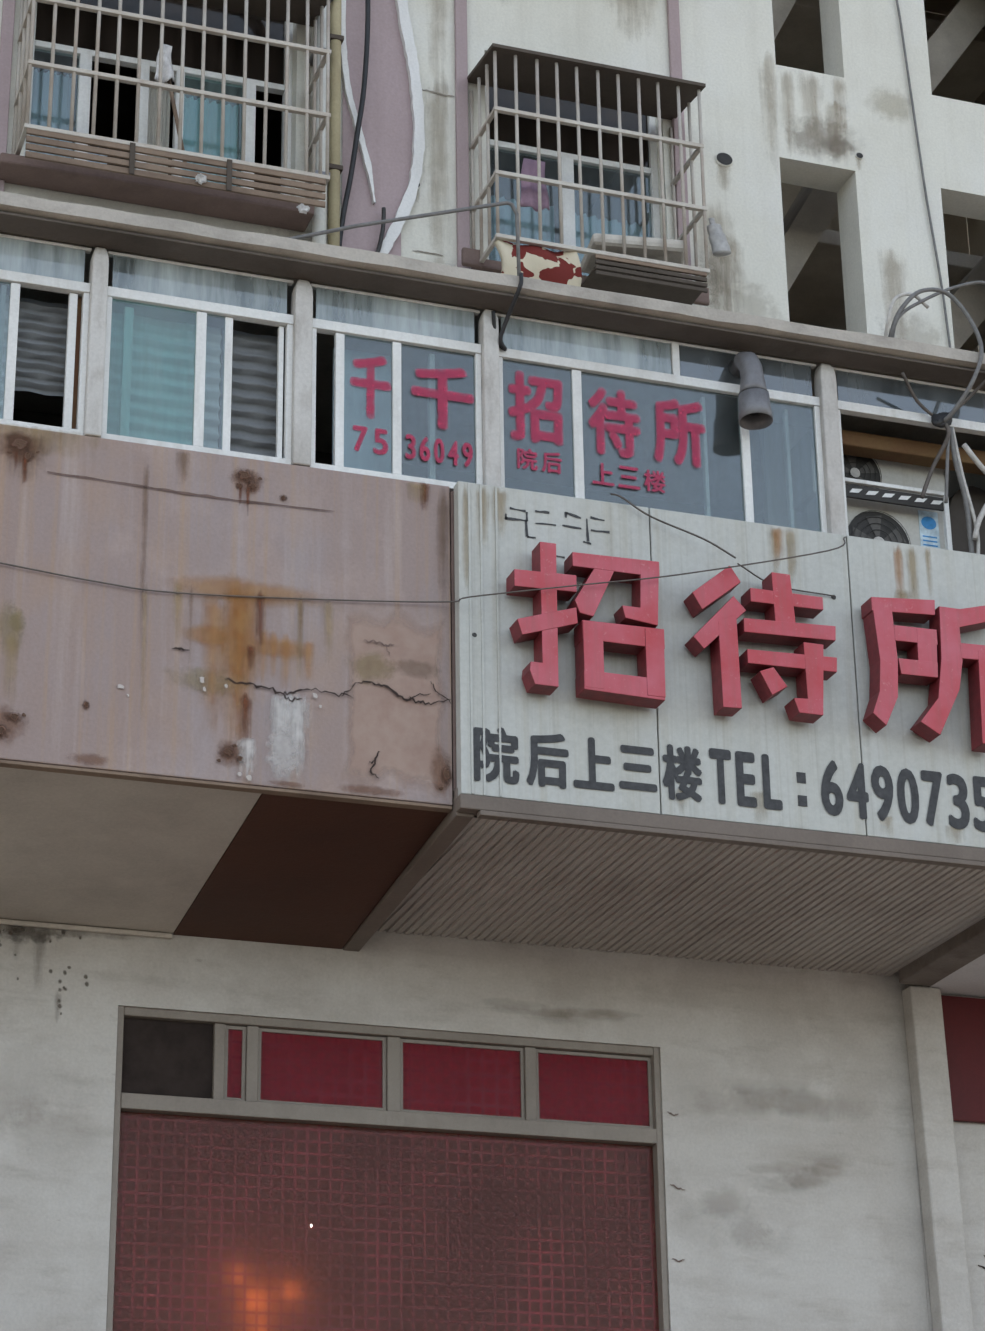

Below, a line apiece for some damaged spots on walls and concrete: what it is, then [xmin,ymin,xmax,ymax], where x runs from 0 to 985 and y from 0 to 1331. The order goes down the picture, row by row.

corrosion [248,593,263,663]
crack [225,639,451,705]
corrosion [243,695,251,728]
leakage [0,925,81,955]